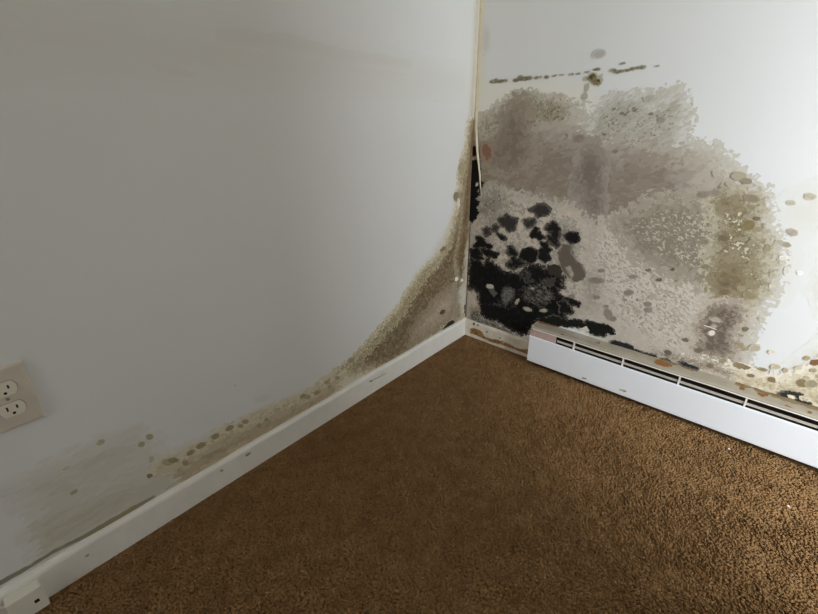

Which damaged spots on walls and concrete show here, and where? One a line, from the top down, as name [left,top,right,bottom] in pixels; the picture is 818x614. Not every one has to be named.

mould [609,62,660,74]
mould [709,193,746,216]
mould [469,226,508,261]
mould [496,213,519,233]
mould [505,244,529,271]
mould [519,241,553,265]
mould [522,200,562,250]
mould [557,217,582,251]
mould [557,241,586,282]
water stain [700,250,759,299]
mould [741,220,755,231]
mould [519,277,556,309]